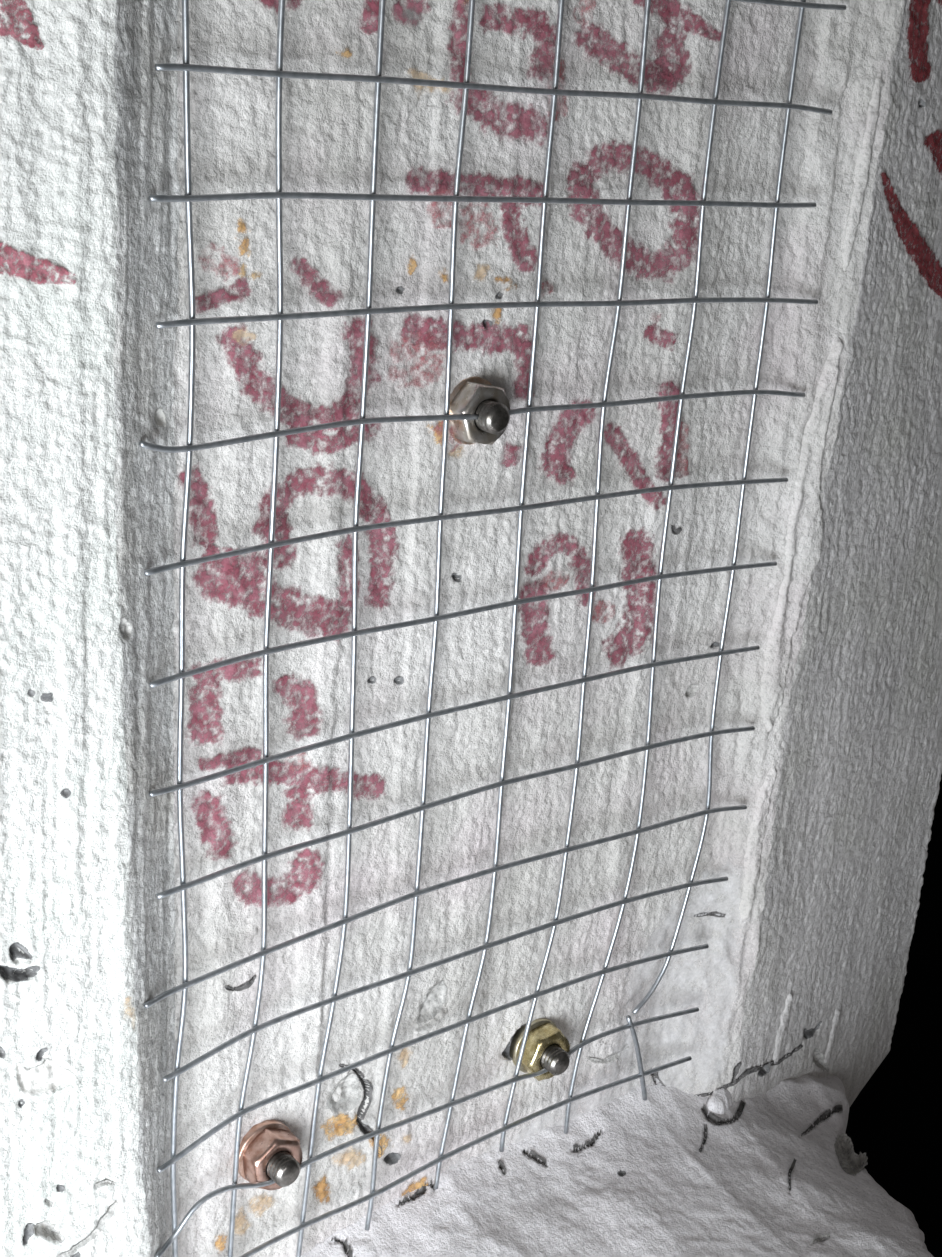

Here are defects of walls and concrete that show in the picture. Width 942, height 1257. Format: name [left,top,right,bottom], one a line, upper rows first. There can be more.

rust [392,1087,408,1110]
rust [321,1114,410,1168]
rust [313,1177,330,1203]
rust [402,1177,428,1196]
rust [215,1197,272,1251]